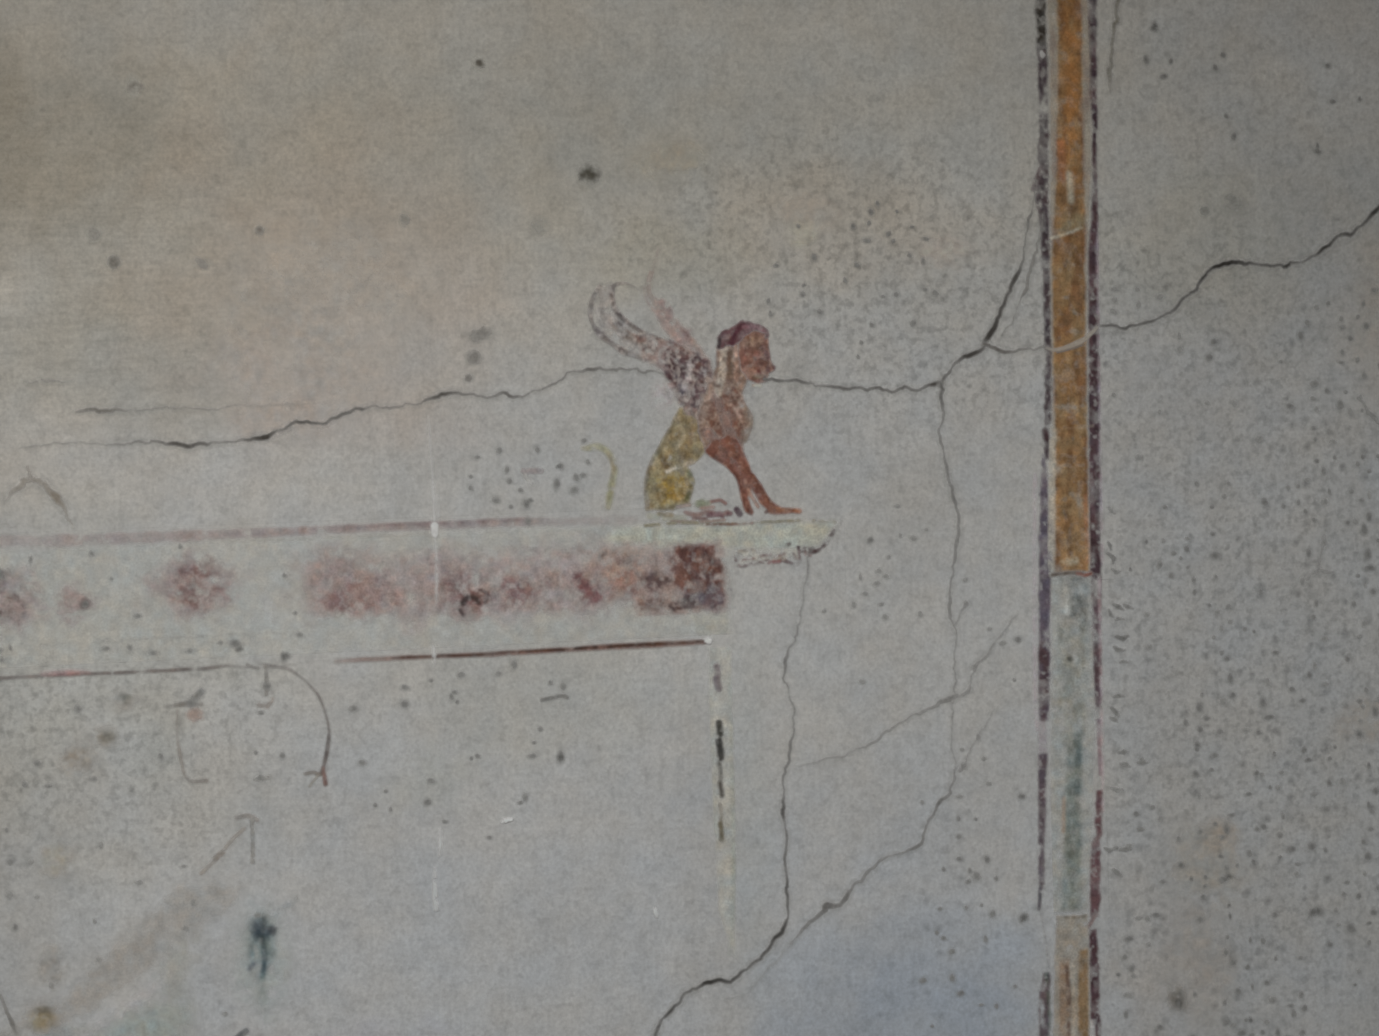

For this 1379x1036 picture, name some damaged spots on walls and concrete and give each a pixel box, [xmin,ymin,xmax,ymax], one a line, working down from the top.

crack [134,367,653,449]
crack [763,204,1379,619]
crack [783,630,798,680]
crack [841,653,989,758]
crack [653,734,965,1036]
crack [0,995,17,1034]